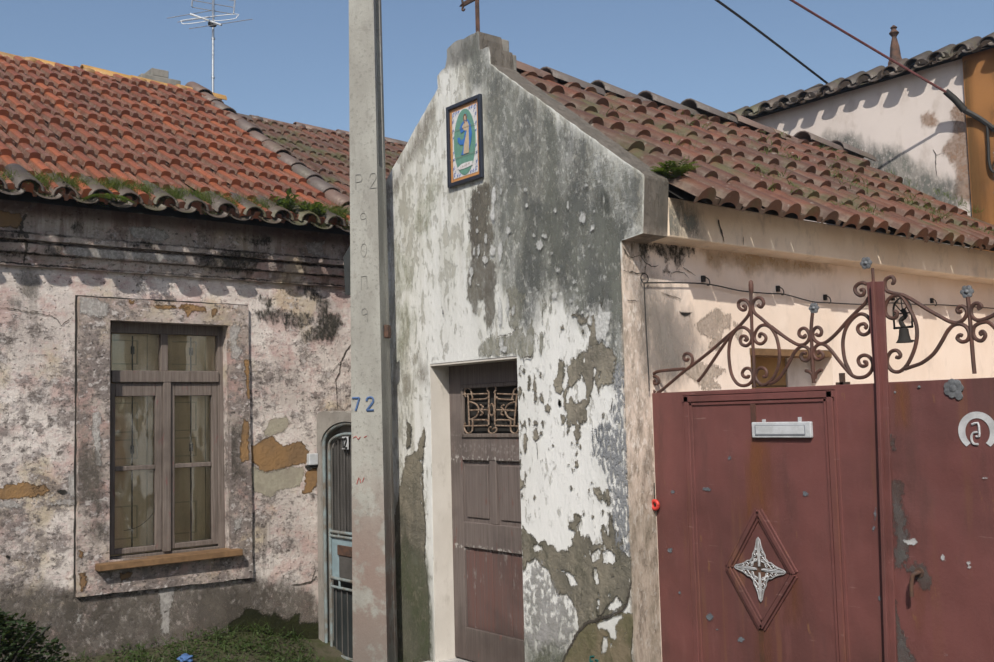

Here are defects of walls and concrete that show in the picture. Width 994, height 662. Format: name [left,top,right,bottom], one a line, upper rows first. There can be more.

peeling [478,186,502,220]
leakage [466,41,640,368]
peeling [473,216,511,264]
flaking render [151,303,217,317]
leakage [254,286,343,342]
crack [333,345,351,411]
flaking render [0,480,67,500]
flaking render [240,419,317,494]
peeling [478,287,633,662]
leakage [395,542,432,662]